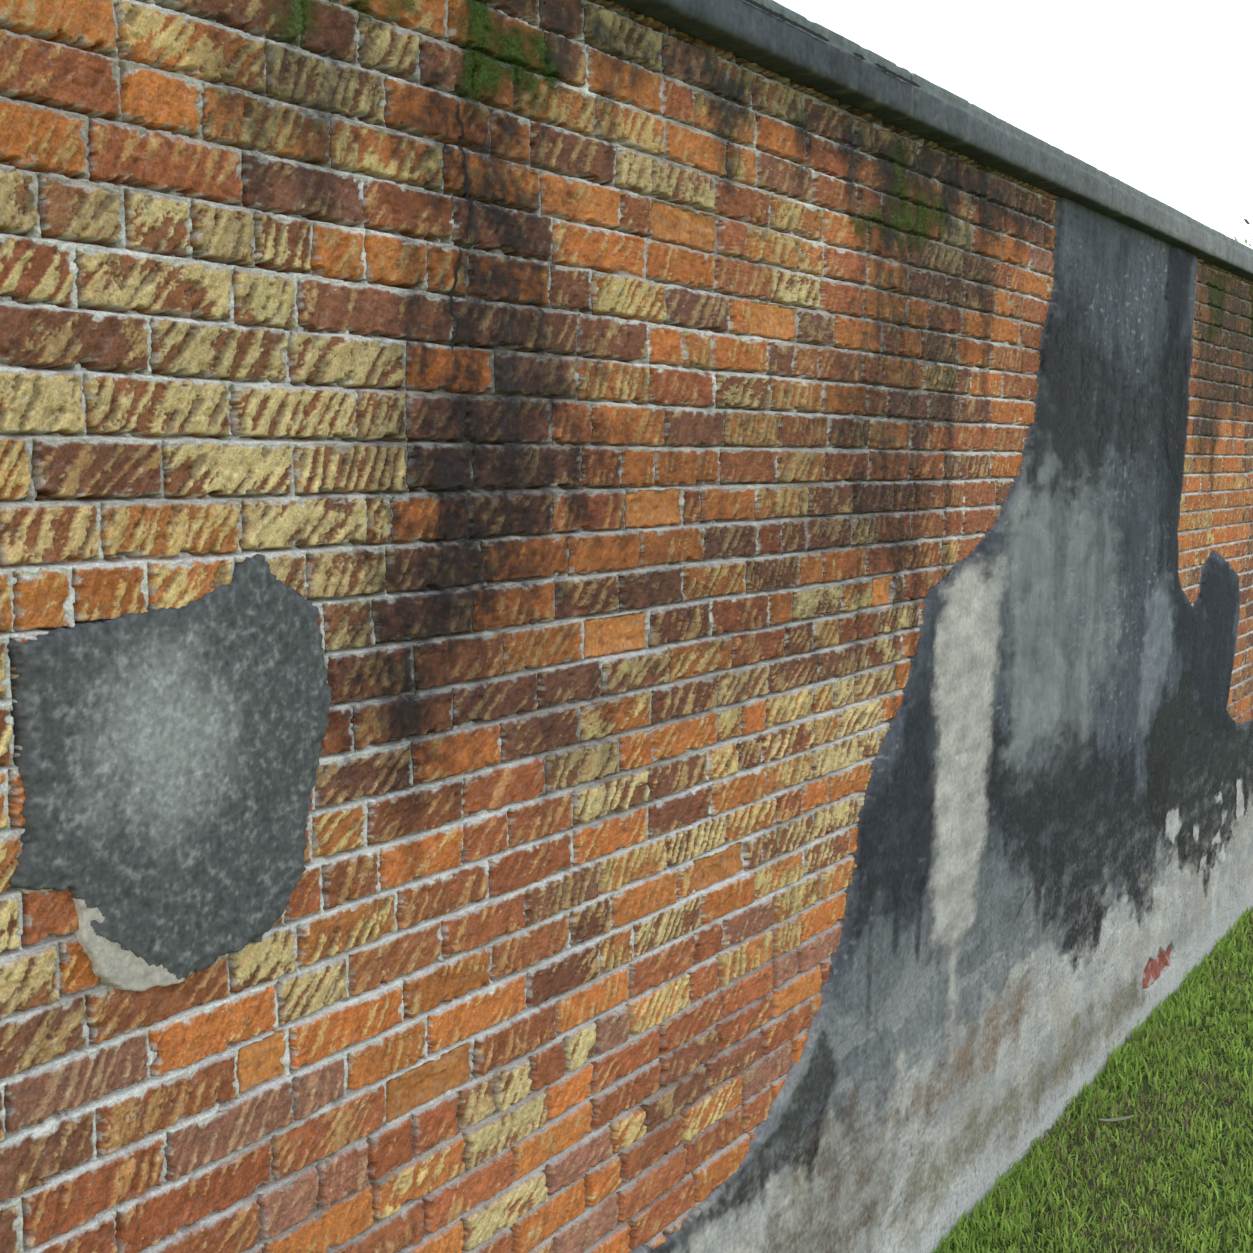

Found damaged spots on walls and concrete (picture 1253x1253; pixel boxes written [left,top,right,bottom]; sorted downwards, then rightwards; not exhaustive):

leakage [793,106,1053,503]
spalling [583,612,646,658]
leakage [852,246,1253,1064]
peeling [624,197,1253,1253]
peeling [69,896,193,992]
spalling [235,1030,286,1093]
spalling [385,1043,471,1122]